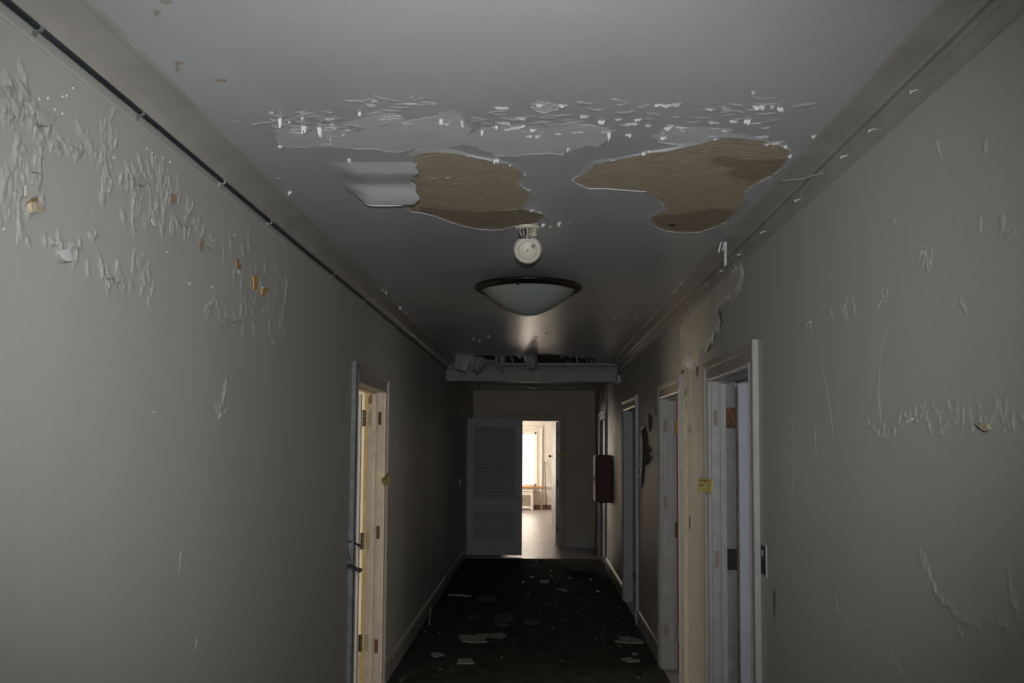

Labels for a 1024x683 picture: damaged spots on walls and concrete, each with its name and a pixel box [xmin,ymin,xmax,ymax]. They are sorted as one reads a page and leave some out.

peeling [229,91,819,234]
flaking render [453,336,602,364]
peeling [678,242,744,683]